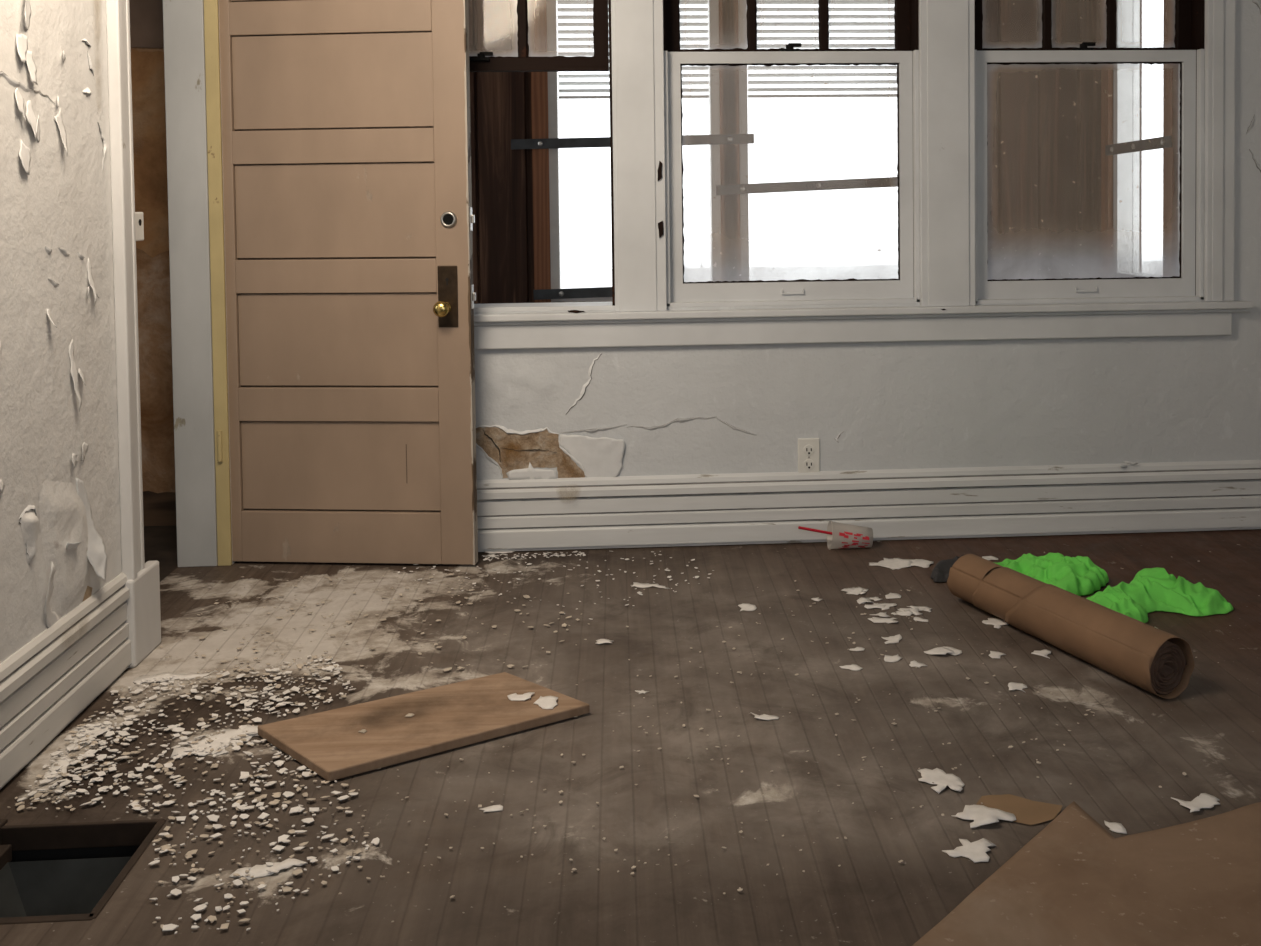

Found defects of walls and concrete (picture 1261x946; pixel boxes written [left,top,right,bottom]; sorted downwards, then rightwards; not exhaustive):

crack [0,71,55,104]
crack [81,39,94,94]
crack [98,123,107,169]
crack [561,353,755,435]
spalling [476,425,625,480]